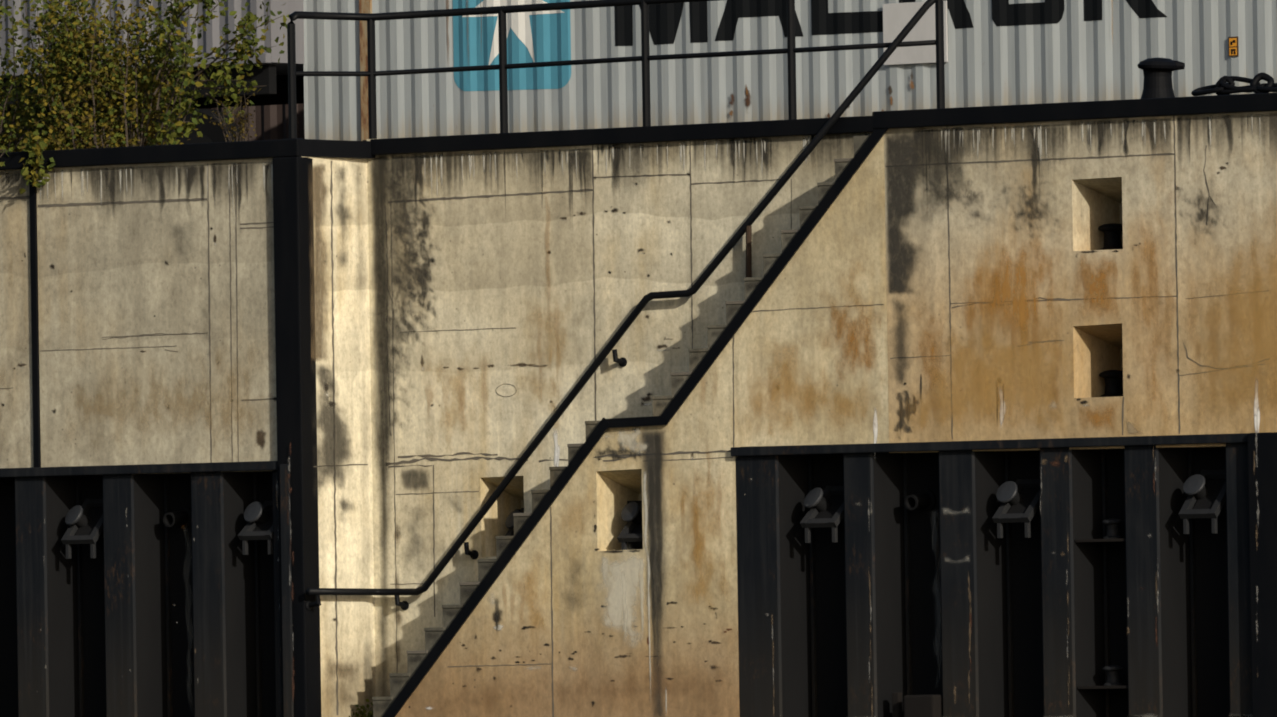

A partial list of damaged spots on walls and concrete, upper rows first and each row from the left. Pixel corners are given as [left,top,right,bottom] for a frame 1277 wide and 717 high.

leakage [0,163,273,208]
leakage [372,133,871,555]
corrosion [729,86,751,116]
corrosion [976,254,1042,334]
leakage [887,114,1277,432]
leakage [598,429,667,715]